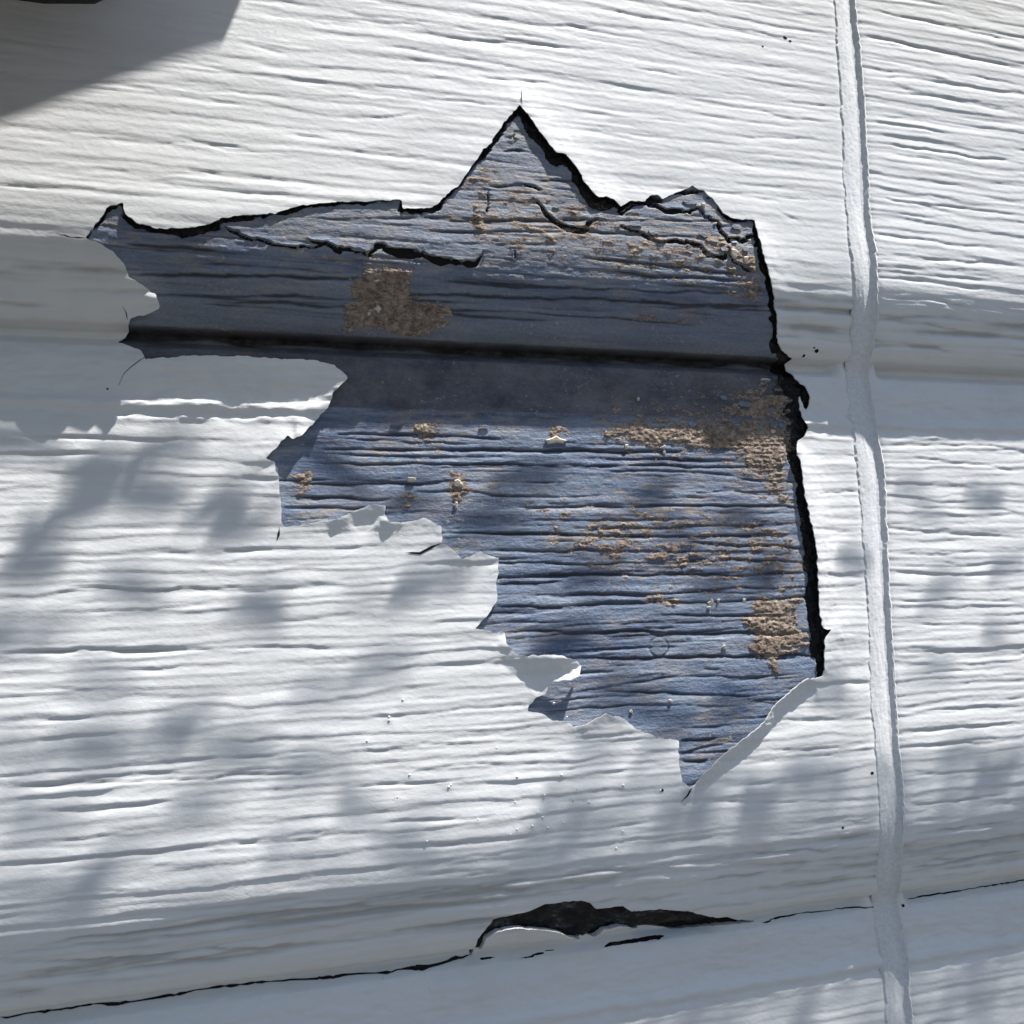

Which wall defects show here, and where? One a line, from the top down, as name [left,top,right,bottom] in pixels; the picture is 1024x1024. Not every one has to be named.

peeling [86,105,831,787]
crack [604,924,665,947]
crack [763,906,873,923]
crack [2,950,552,1018]